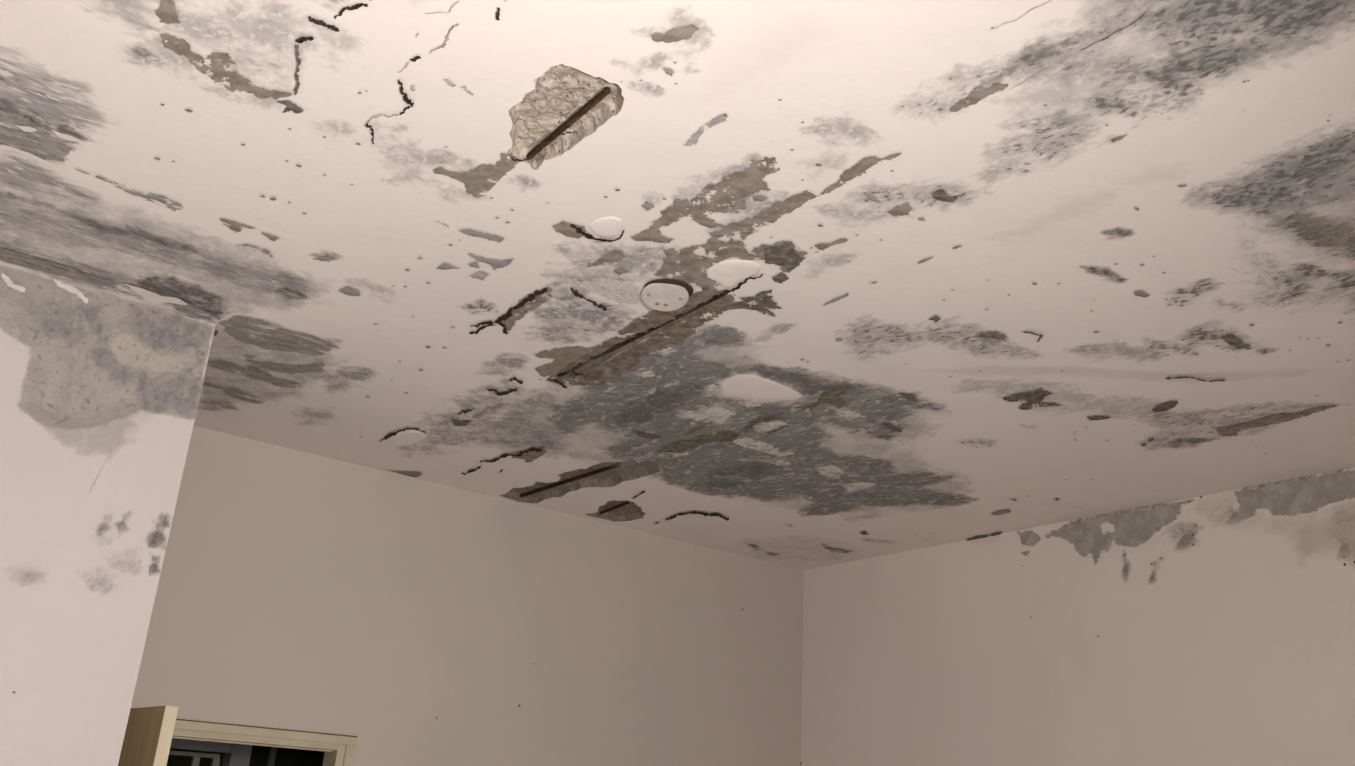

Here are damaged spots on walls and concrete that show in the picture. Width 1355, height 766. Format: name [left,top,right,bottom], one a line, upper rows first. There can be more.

mould [0,60,92,145]
peeling [155,0,304,114]
crack [294,0,370,95]
crack [365,0,474,144]
spalling [433,64,624,198]
mould [1143,0,1355,96]
mould [1203,130,1355,256]
mould [0,243,340,411]
spalling [469,287,553,335]
peeling [533,153,902,388]
spalling [499,415,789,522]
damp [436,325,976,515]